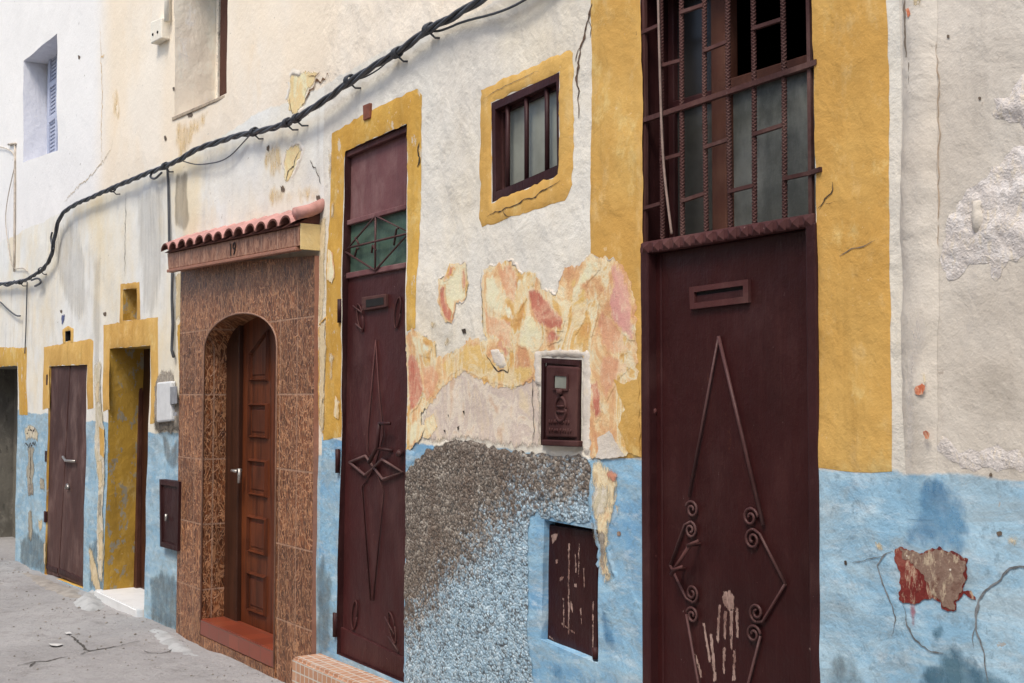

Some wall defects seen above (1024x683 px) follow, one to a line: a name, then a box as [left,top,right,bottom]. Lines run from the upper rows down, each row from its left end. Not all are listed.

peeling [285,68,329,114]
crack [575,4,592,118]
flaking render [992,73,1024,127]
peeling [280,141,305,192]
flaking render [940,146,1024,281]
flaking render [403,254,641,683]
flaking render [923,430,1024,477]
crack [852,551,939,653]
peeling [877,543,976,612]
crack [972,566,1024,681]